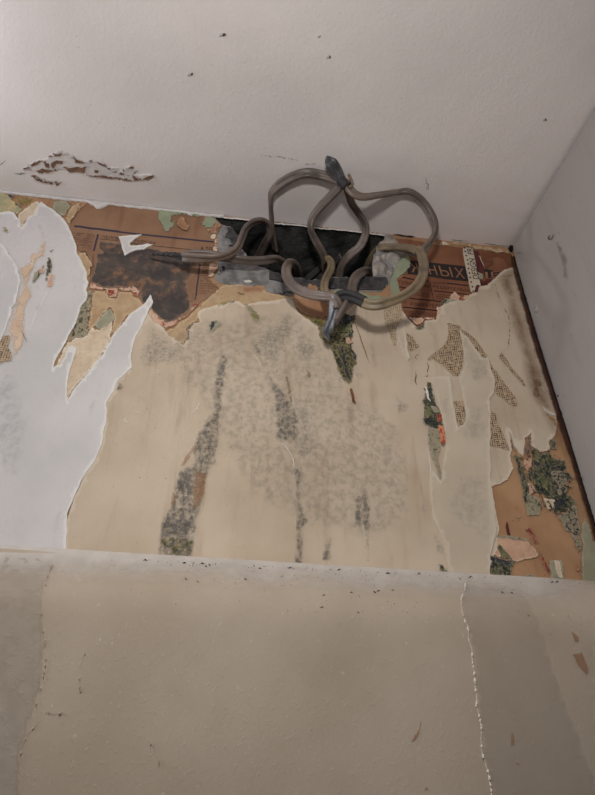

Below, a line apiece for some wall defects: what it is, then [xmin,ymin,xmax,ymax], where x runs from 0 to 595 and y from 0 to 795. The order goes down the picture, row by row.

peeling [22,150,155,185]
spalling [0,190,396,296]
leakage [313,314,355,376]
leakage [273,385,297,439]
leakage [161,356,226,556]